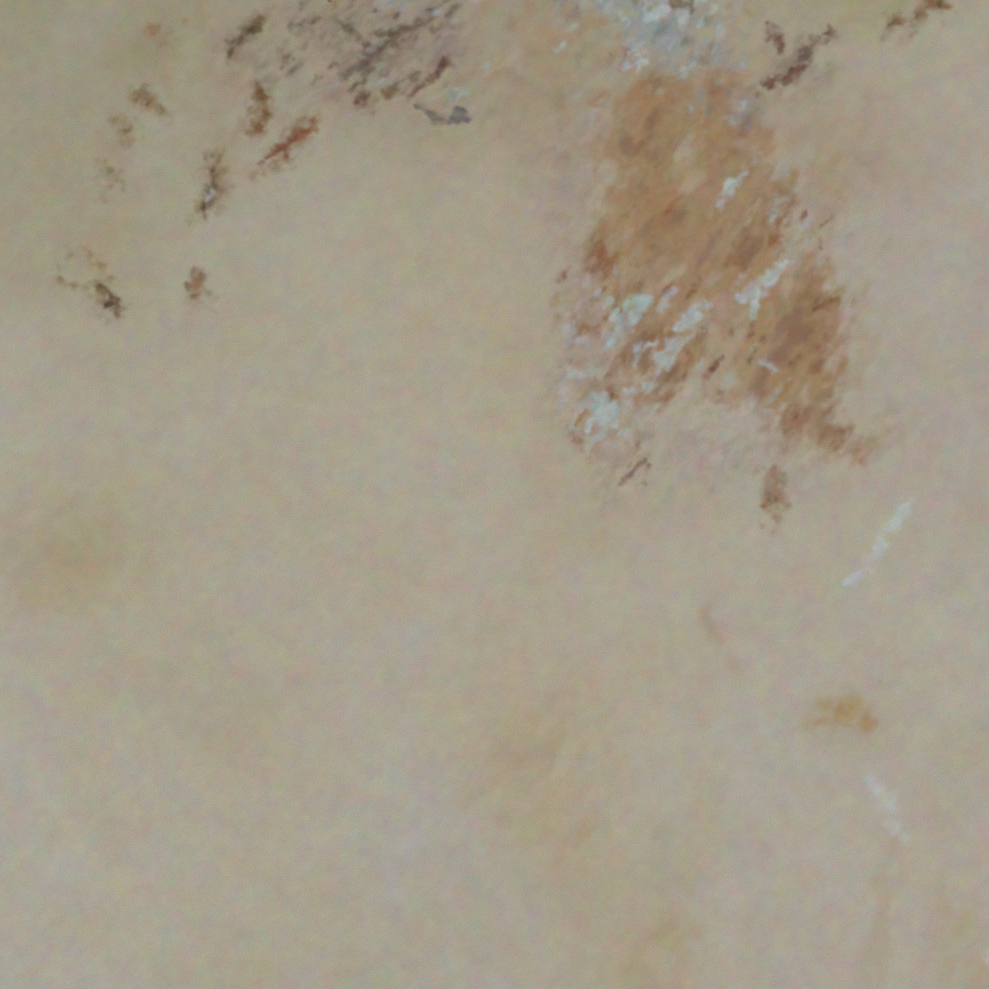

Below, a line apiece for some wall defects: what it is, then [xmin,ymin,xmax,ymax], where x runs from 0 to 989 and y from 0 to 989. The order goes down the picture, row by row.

spalling [182,2,387,230]
spalling [412,75,494,131]
water stain [549,0,762,85]
spalling [519,4,940,551]